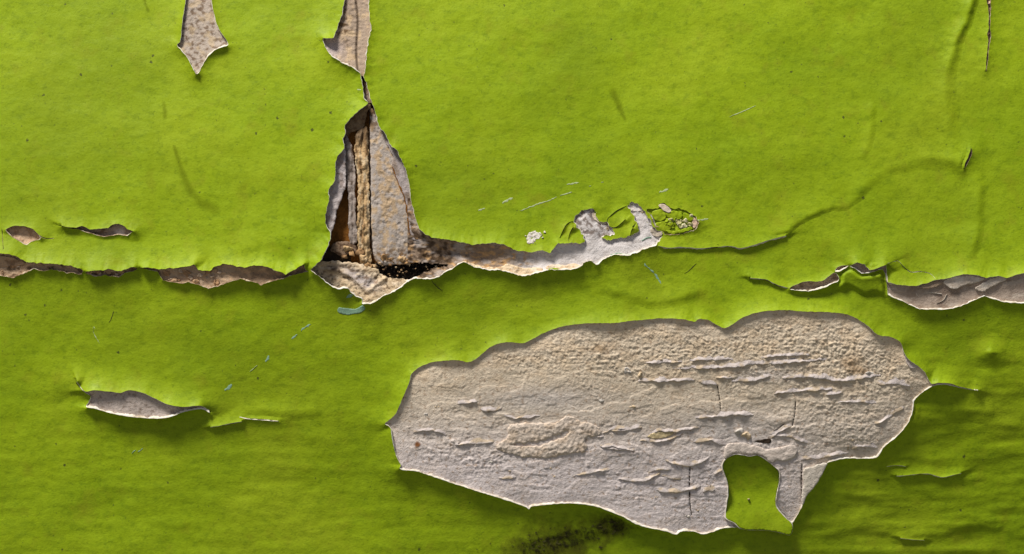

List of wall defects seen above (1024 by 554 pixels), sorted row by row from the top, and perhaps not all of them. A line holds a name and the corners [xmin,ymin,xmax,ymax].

peeling [177,0,228,74]
peeling [323,0,371,76]
peeling [6,226,53,245]
peeling [61,224,133,237]
spalling [311,103,786,315]
peeling [846,262,1024,310]
peeling [77,382,210,419]
peeling [385,310,978,534]